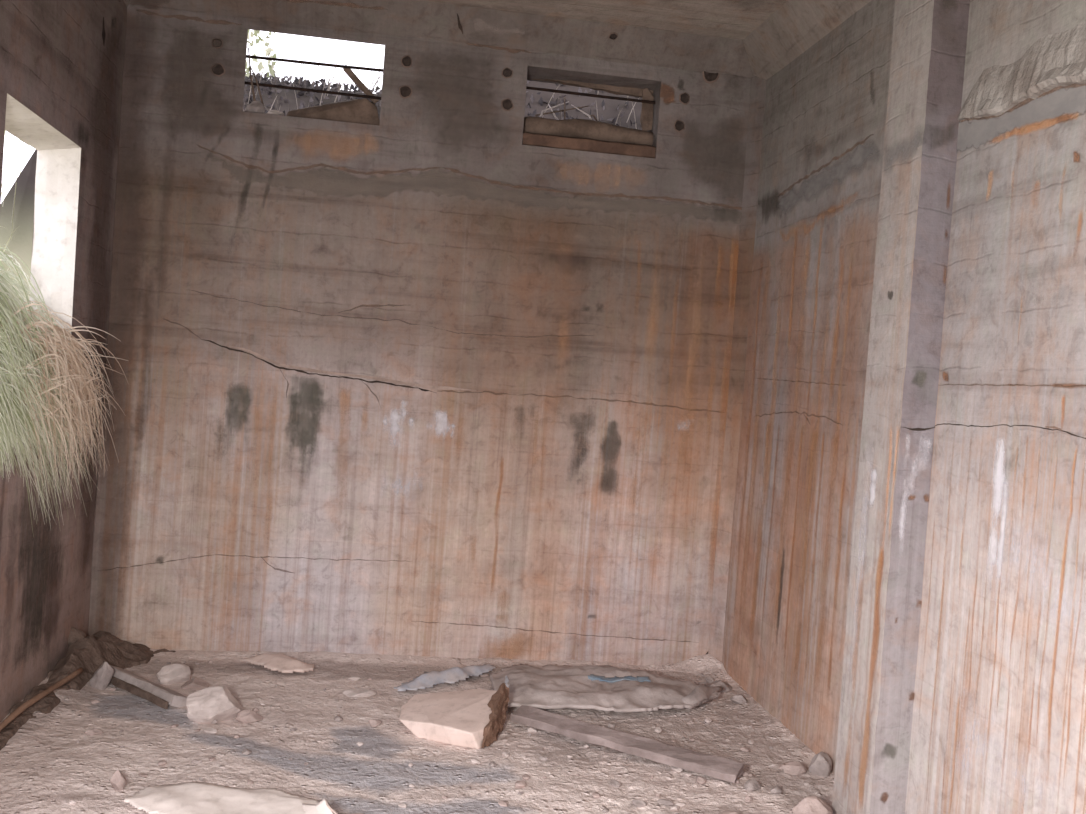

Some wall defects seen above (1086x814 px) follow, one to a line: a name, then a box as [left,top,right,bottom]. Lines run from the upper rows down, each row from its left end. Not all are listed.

crack [201,339,476,393]
leakage [602,422,620,488]
crack [903,423,1086,439]